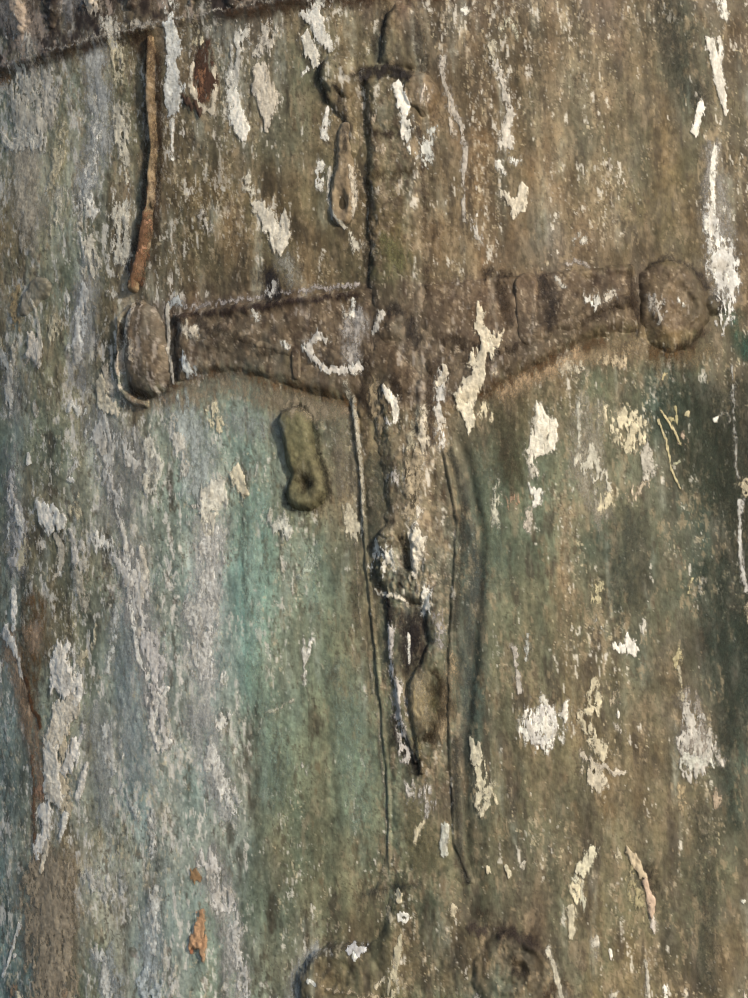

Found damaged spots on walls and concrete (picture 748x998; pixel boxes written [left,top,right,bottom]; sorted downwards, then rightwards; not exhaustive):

water stain [715,0,729,20]
corrosion [181,32,219,118]
water stain [487,18,521,175]
water stain [658,0,706,137]
water stain [705,35,729,116]
corrosion [127,166,162,288]
peeling [518,694,569,755]